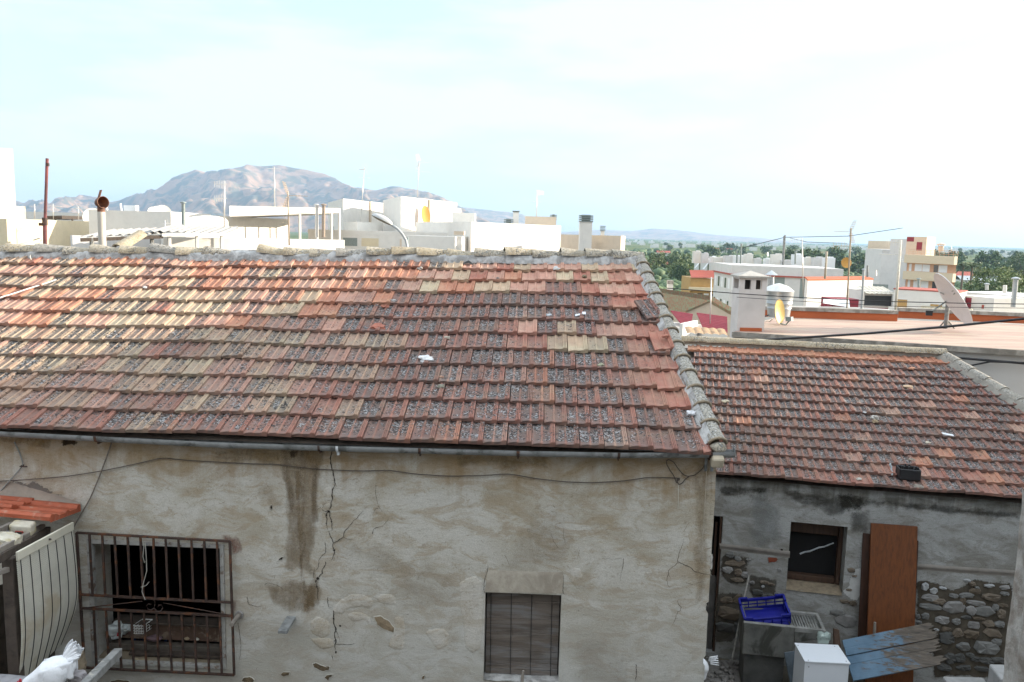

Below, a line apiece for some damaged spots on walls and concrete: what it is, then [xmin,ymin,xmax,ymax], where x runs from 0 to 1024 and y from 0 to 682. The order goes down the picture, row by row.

water stain [841,496,868,508]
crack [313,451,388,659]
flaking render [373,615,395,633]